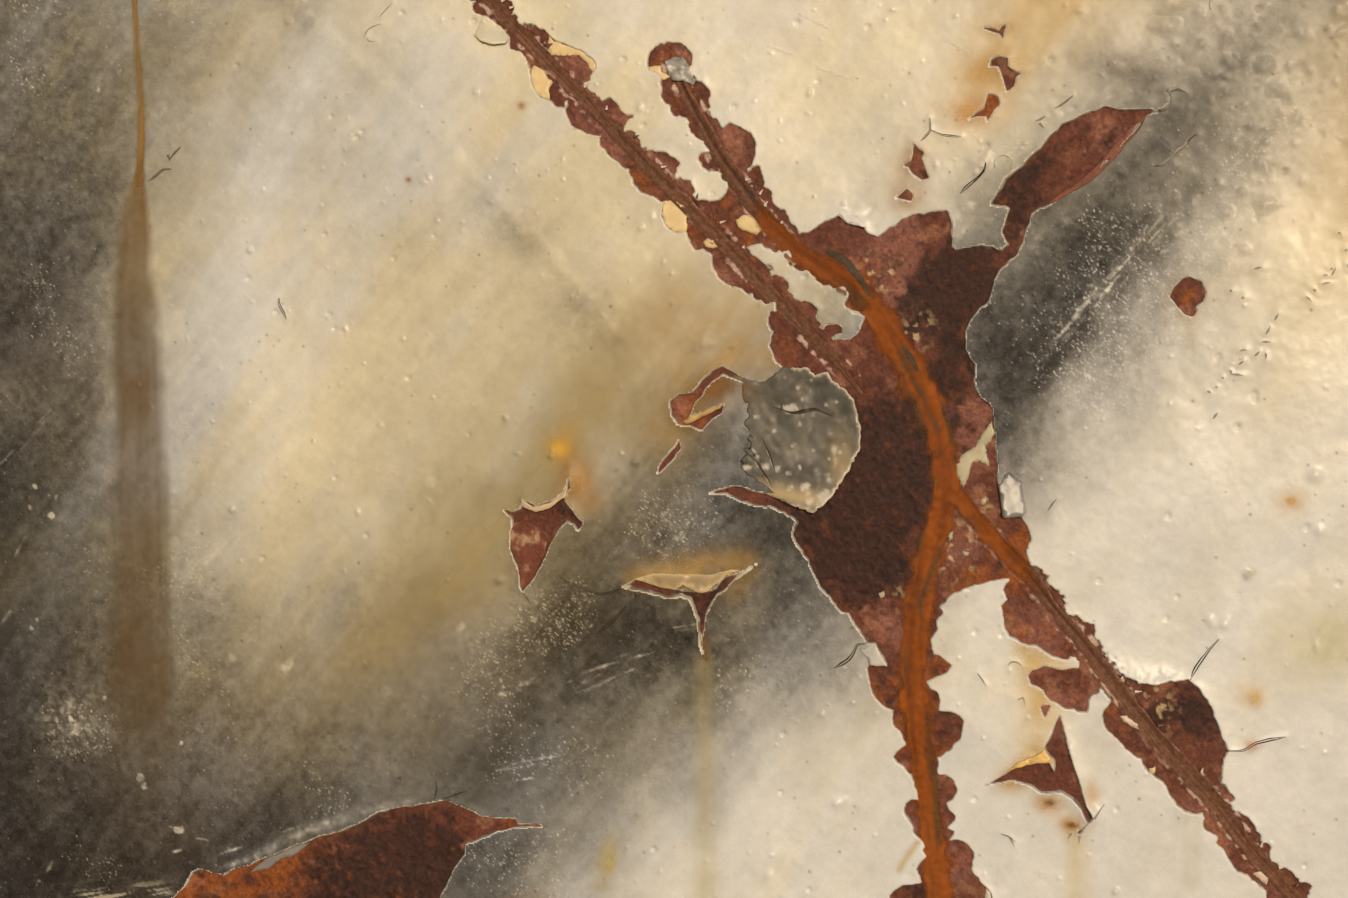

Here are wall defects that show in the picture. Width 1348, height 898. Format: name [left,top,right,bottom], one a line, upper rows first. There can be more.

water stain [121,0,146,316]
water stain [117,333,156,451]
rust [551,439,570,458]
rust [679,341,742,398]
peeling [471,0,1312,898]
peeling [175,781,541,898]